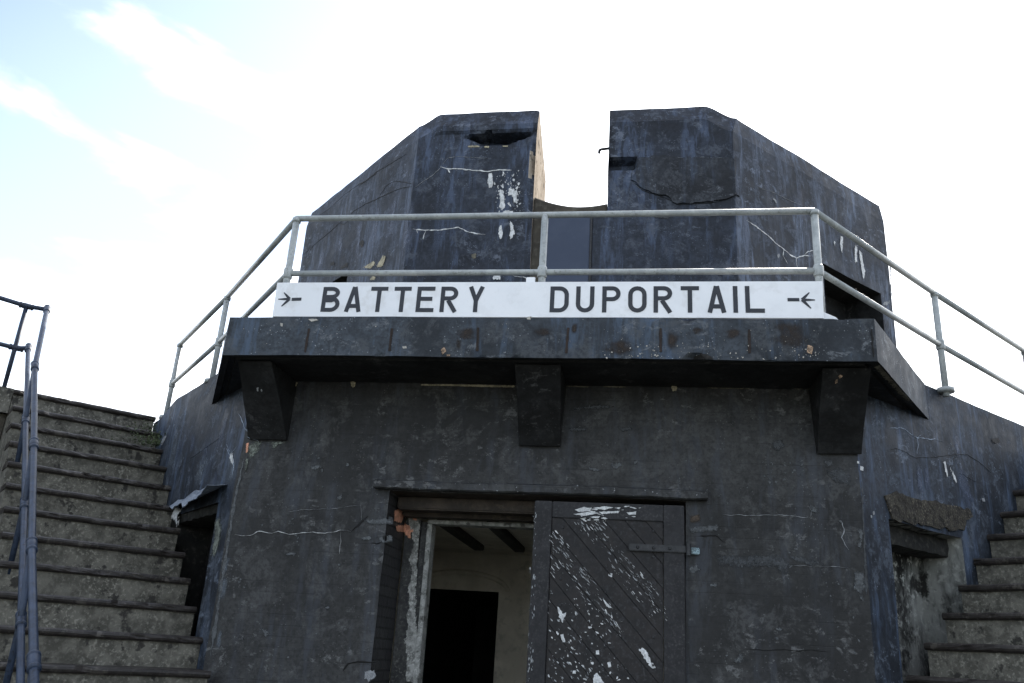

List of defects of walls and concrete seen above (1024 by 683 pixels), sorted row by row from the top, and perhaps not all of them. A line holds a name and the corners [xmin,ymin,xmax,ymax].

crack [301,154,509,256]
peeling [487,170,528,239]
crack [748,221,813,264]
peeling [834,236,865,279]
peeling [168,442,292,655]
crack [240,506,385,552]
peeling [361,509,421,683]
peeling [548,530,629,683]
peeling [574,506,667,621]
crack [700,507,811,542]